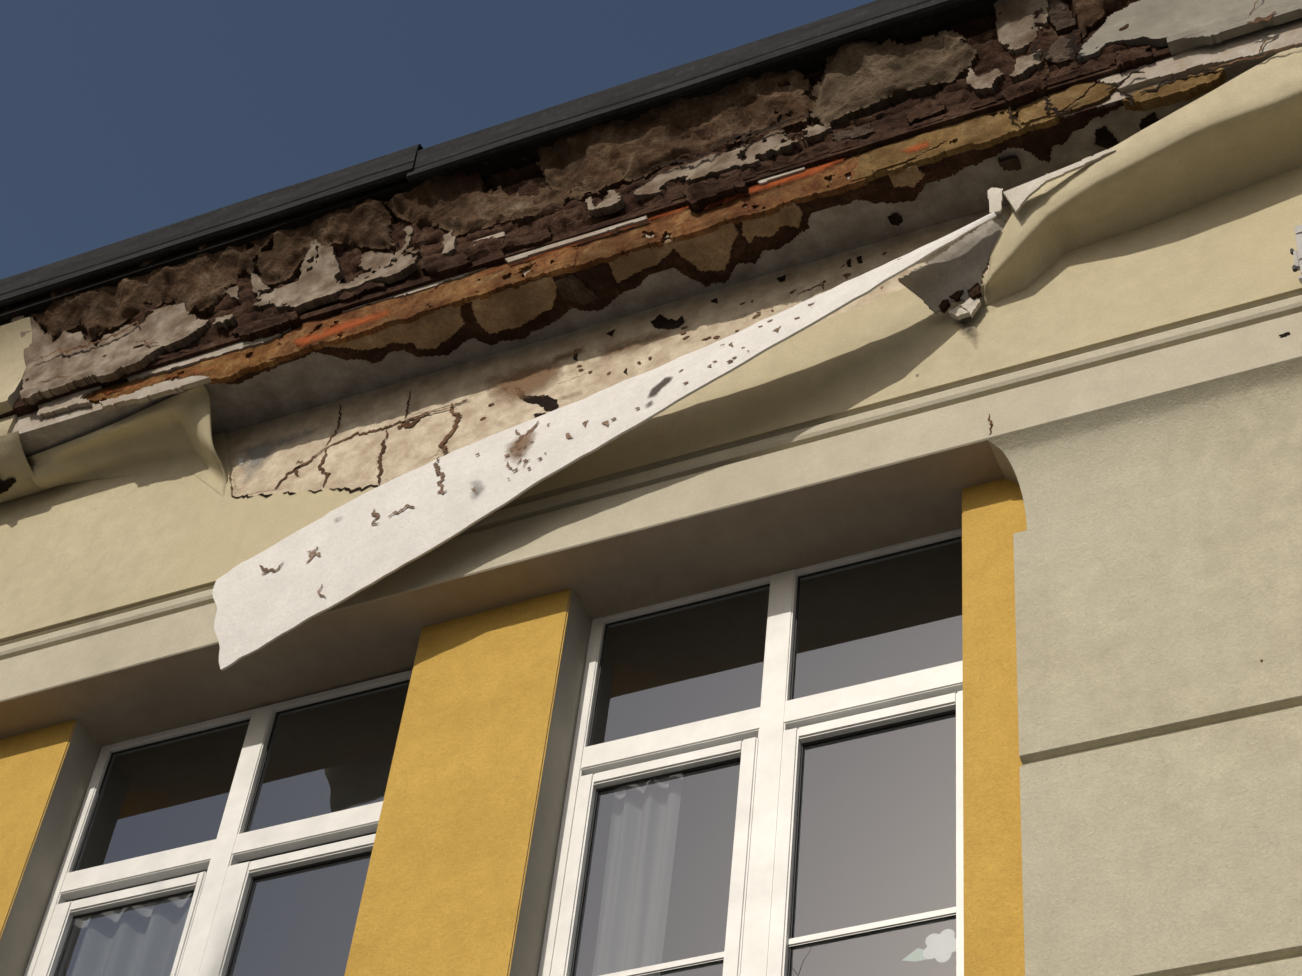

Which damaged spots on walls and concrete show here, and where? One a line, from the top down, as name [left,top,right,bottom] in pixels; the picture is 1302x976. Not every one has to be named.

crack [232,391,468,525]
spalling [5,0,1302,671]